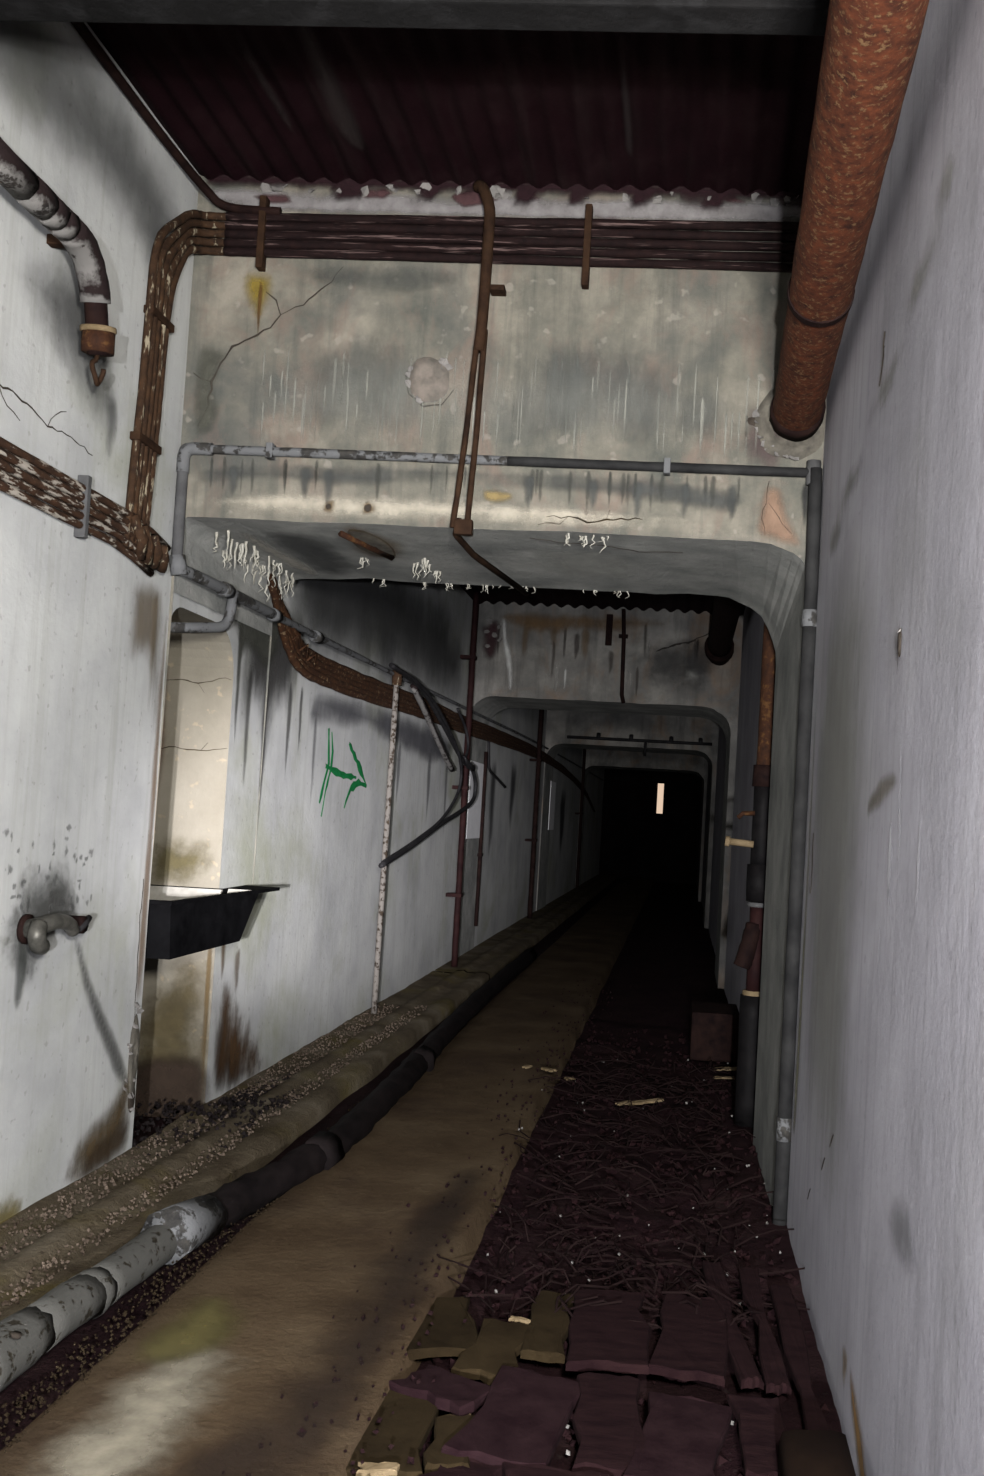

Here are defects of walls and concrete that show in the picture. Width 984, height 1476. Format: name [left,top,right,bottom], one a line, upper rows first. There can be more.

crack [193,266,344,426]
crack [0,384,93,456]
leakage [472,390,523,437]
leakage [246,470,613,552]
leakage [213,530,450,787]
leakage [498,619,512,686]
leakage [490,771,515,833]
leakage [15,880,74,1001]